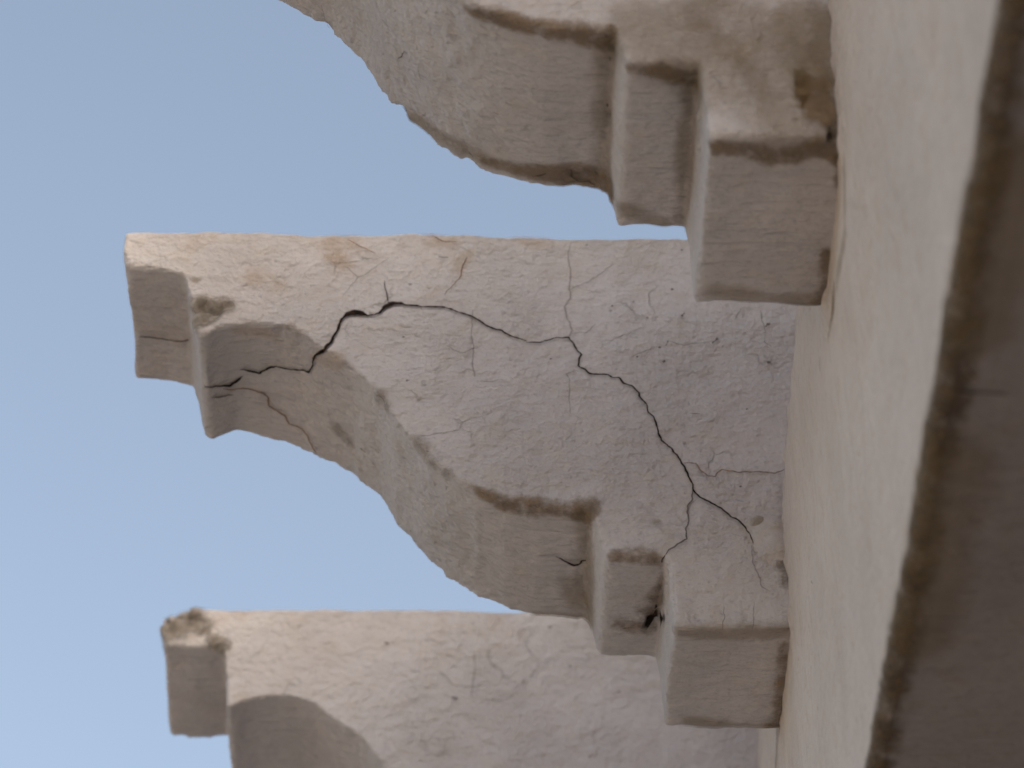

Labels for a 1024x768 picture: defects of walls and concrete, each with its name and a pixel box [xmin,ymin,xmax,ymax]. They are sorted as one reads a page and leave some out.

water stain [710,138,839,164]
water stain [821,250,834,329]
crack [204,234,783,563]
water stain [475,489,596,523]
spalling [160,607,231,655]